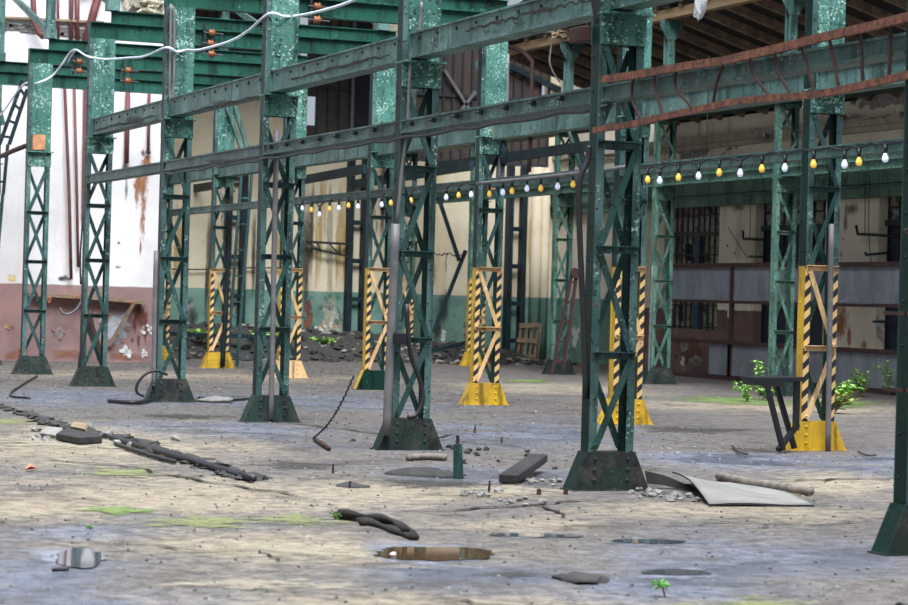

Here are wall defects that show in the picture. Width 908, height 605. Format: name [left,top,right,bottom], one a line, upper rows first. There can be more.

corrosion [133,176,148,254]
peeling [96,312,152,358]